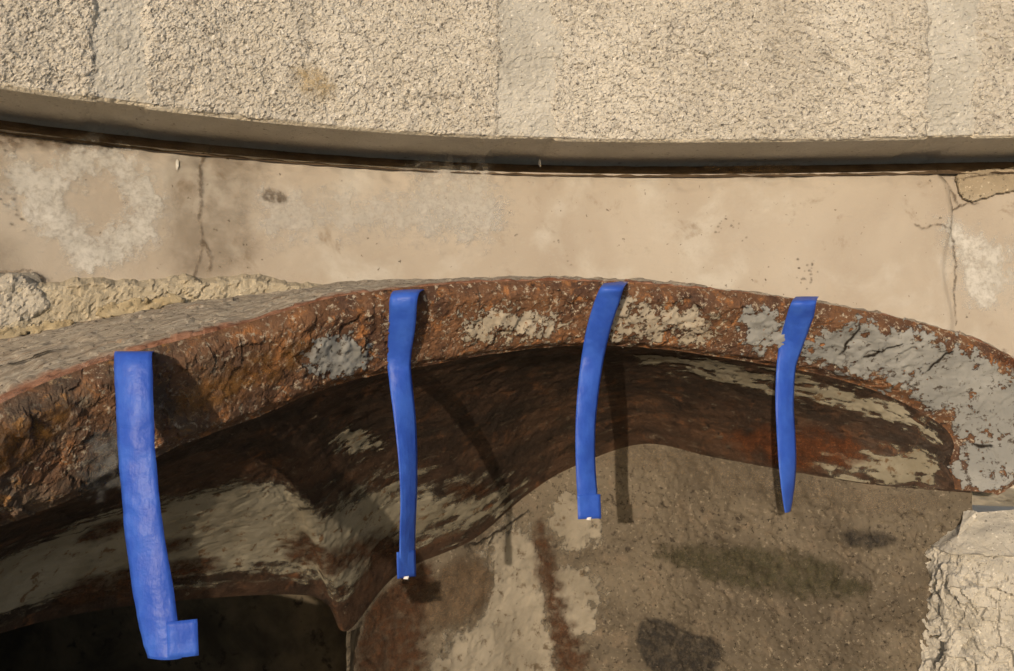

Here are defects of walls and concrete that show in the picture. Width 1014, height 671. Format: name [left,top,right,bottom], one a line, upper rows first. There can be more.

damp [4,141,165,274]
peeling [457,290,570,351]
peeling [609,286,785,396]
peeling [794,313,1014,492]
corrosion [734,431,778,463]
corrosion [82,521,123,541]
corrosion [166,538,217,577]
corrosion [280,533,399,575]
corrosion [58,569,132,606]
damp [637,620,721,671]